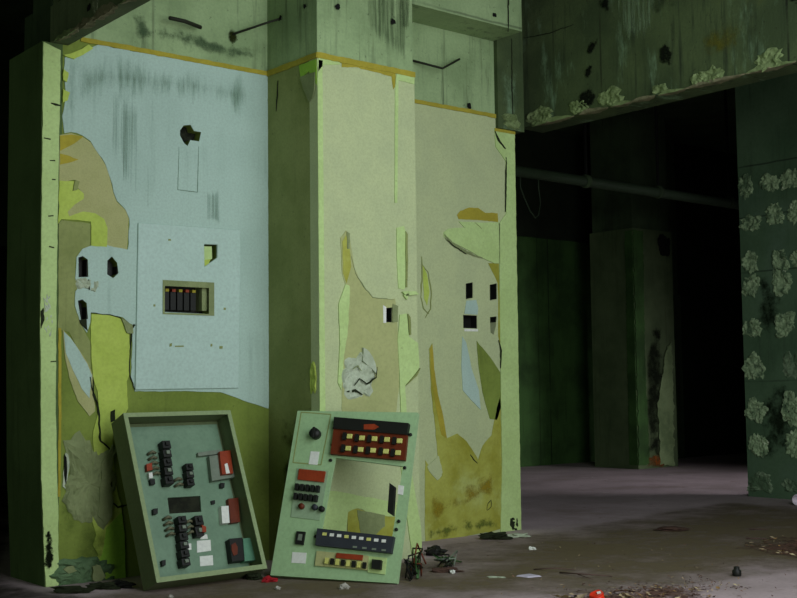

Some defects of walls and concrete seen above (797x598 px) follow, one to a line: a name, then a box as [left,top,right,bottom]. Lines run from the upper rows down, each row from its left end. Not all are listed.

peeling [299,58,415,203]
leakage [579,89,595,107]
leakage [660,44,672,65]
peeling [41,45,269,586]
peeling [338,226,420,412]
peeling [444,207,500,342]
peeling [407,329,518,554]
leakage [648,330,662,455]
leakage [766,390,793,452]
peeling [323,491,397,536]